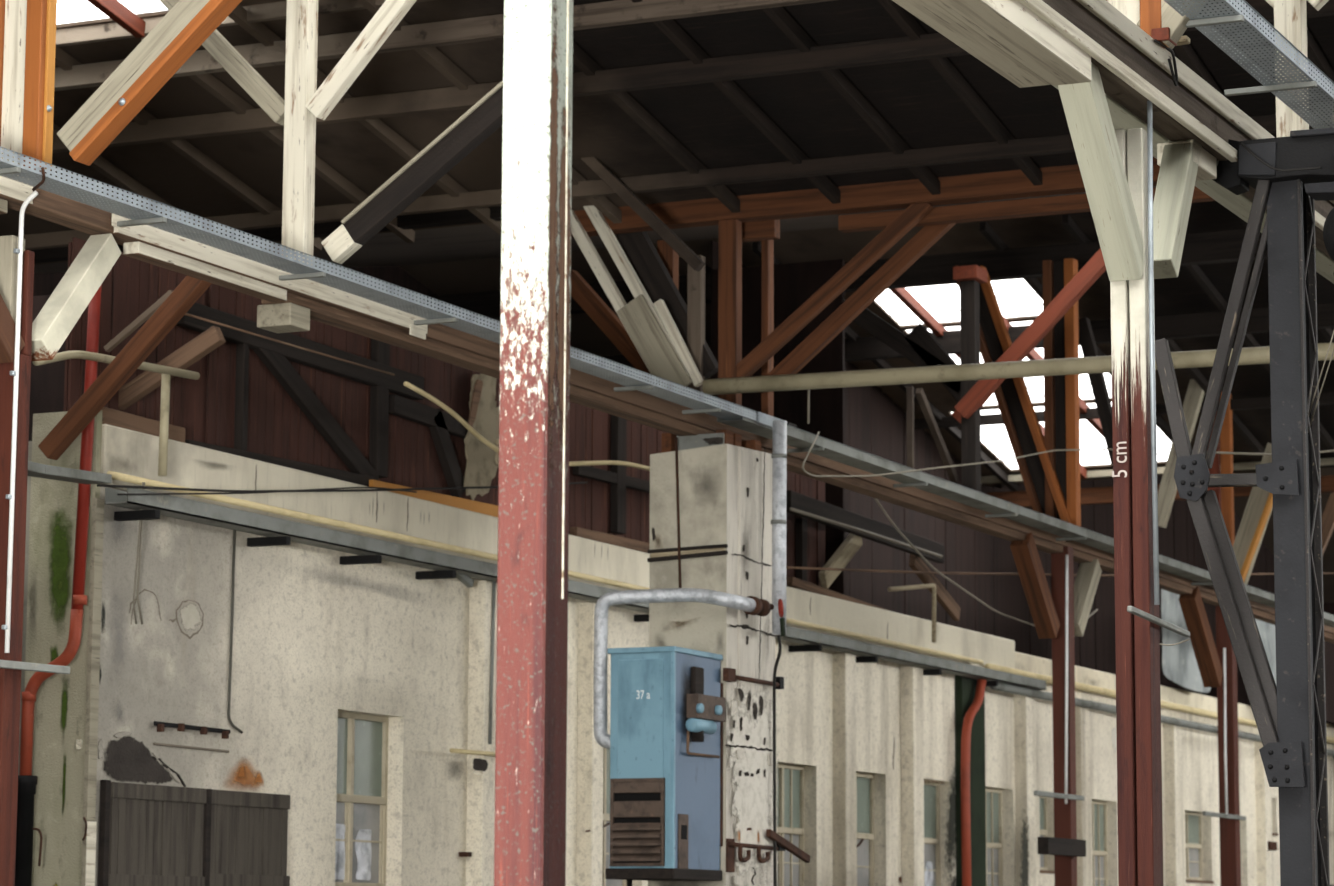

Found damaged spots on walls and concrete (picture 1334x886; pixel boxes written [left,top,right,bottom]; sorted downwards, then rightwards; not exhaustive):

flaking render [76,731,186,787]
flaking render [472,758,488,775]
peeling [727,684,778,886]